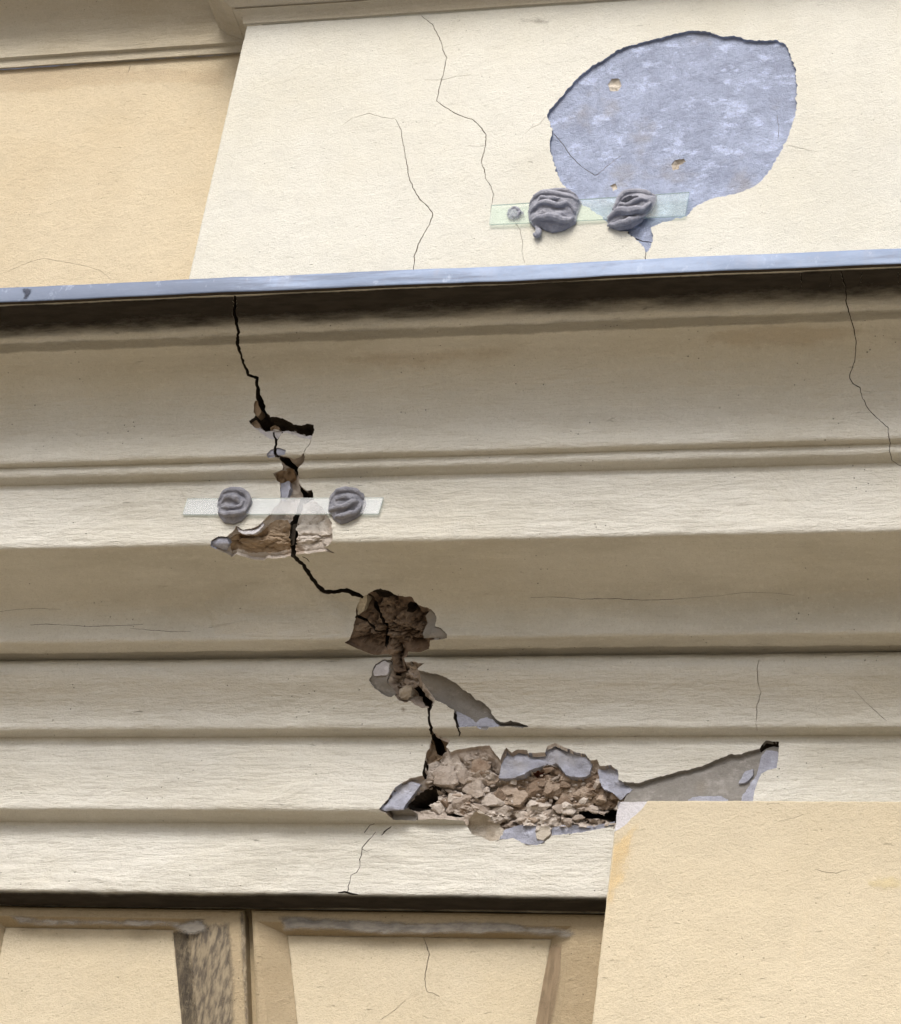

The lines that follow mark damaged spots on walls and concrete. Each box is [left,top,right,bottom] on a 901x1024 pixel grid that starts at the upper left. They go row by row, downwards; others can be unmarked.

crack [343,113,433,270]
crack [421,15,494,212]
flaking render [547,30,798,252]
crack [232,294,268,416]
crack [841,272,901,466]
spalling [210,401,334,560]
crack [290,524,364,598]
crack [422,705,448,779]
spalling [345,589,779,845]
crack [338,824,391,895]